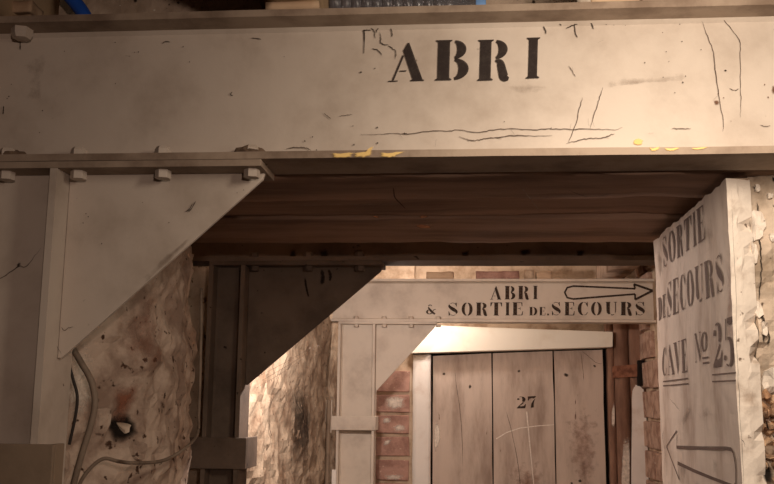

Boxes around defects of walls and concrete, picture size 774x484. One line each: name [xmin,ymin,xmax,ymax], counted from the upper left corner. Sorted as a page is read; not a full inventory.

crack [702,20,742,129]
crack [361,88,622,145]
spalling [750,210,774,264]
spalling [755,301,768,337]
spalling [761,367,774,484]